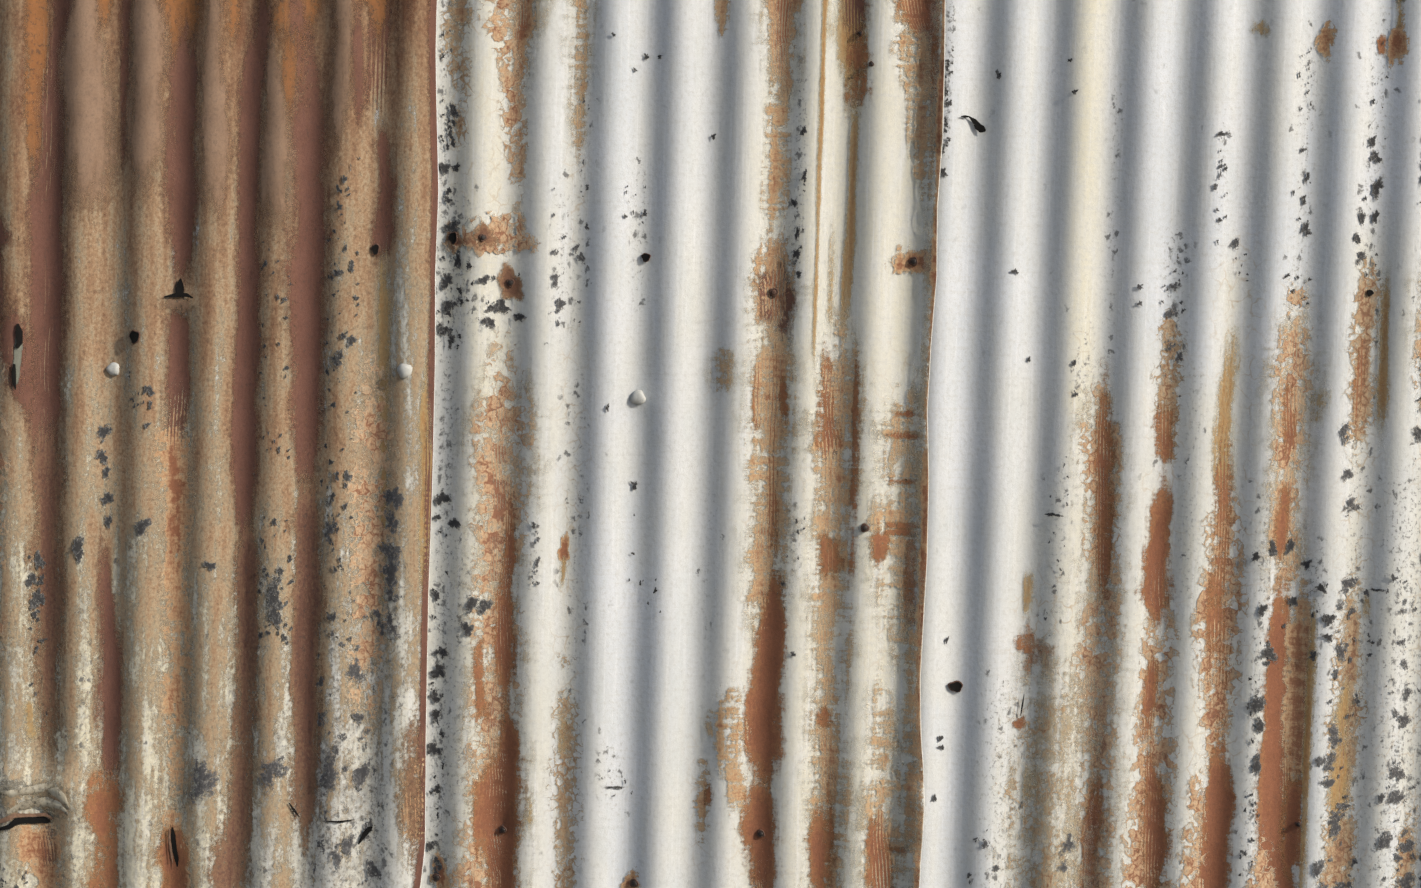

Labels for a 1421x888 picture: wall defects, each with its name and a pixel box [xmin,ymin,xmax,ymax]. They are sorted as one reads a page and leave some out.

rust [569,0,590,156]
rust [1252,20,1269,35]
rust [1315,20,1337,63]
rust [1377,0,1410,68]
rust [1342,257,1390,468]
rust [0,0,548,888]
rust [693,0,945,888]
rust [557,531,570,582]
rust [994,282,1370,888]
rust [547,689,583,888]
rust [620,870,640,888]